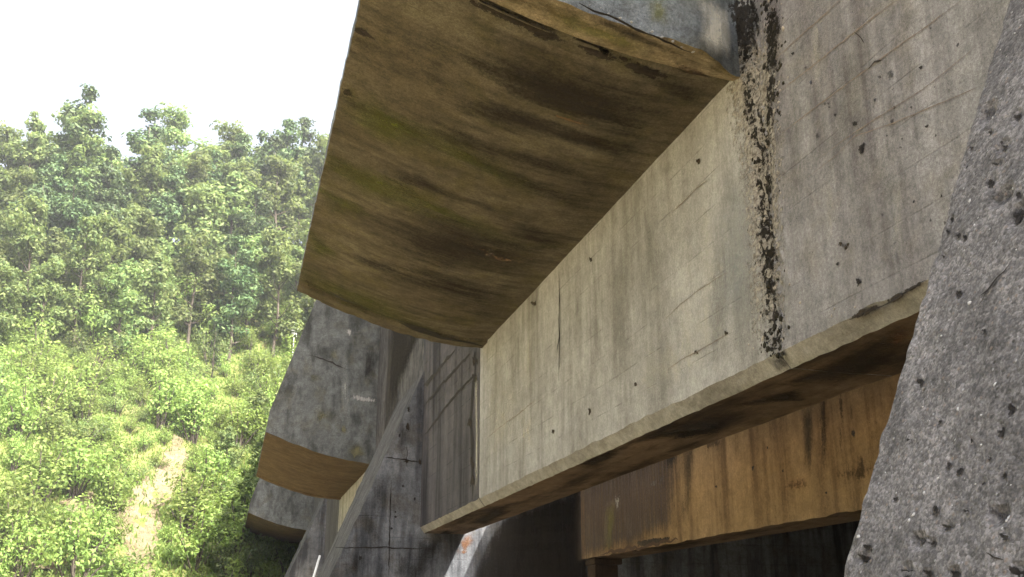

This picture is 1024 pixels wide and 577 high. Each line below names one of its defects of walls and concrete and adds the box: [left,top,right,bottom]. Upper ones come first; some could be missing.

water stain [468,59,648,159]